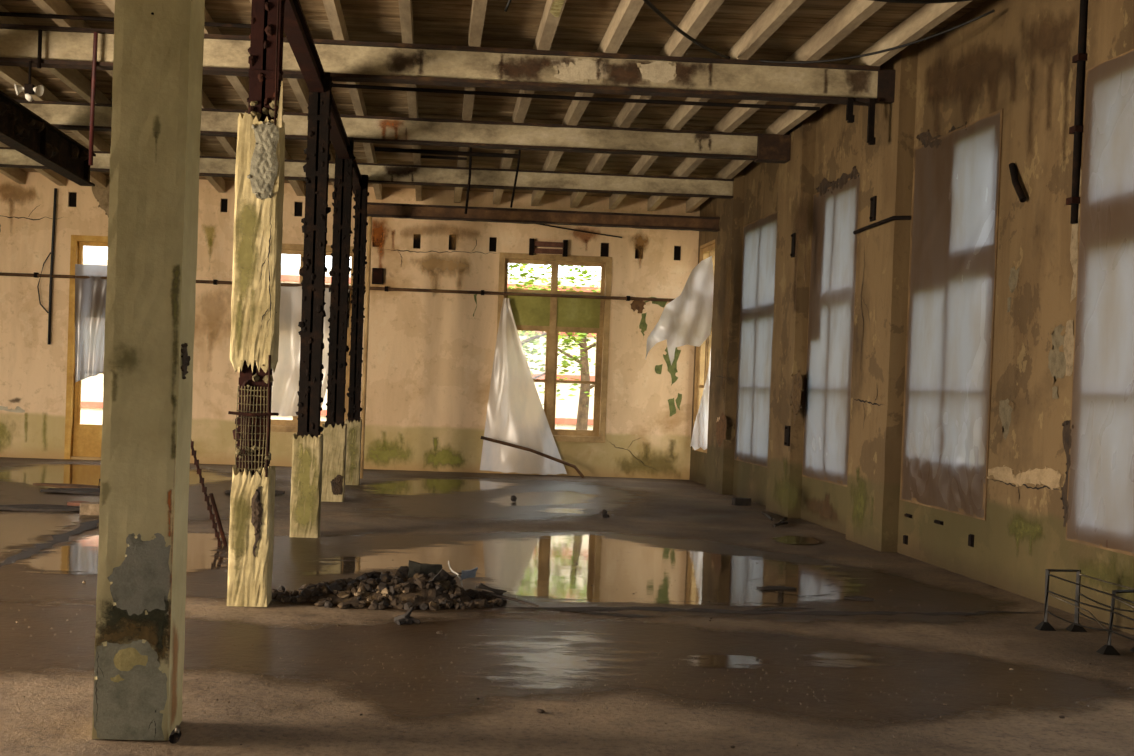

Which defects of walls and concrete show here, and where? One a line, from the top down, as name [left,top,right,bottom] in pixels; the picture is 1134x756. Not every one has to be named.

spalling [247,121,279,200]
peeling [630,297,667,338]
peeling [655,347,682,416]
water stain [0,465,100,519]
water stain [622,441,674,473]
spalling [987,420,1074,527]
water stain [0,534,171,674]
peeling [107,533,172,616]
water stain [184,469,1134,726]
peeling [93,639,167,740]